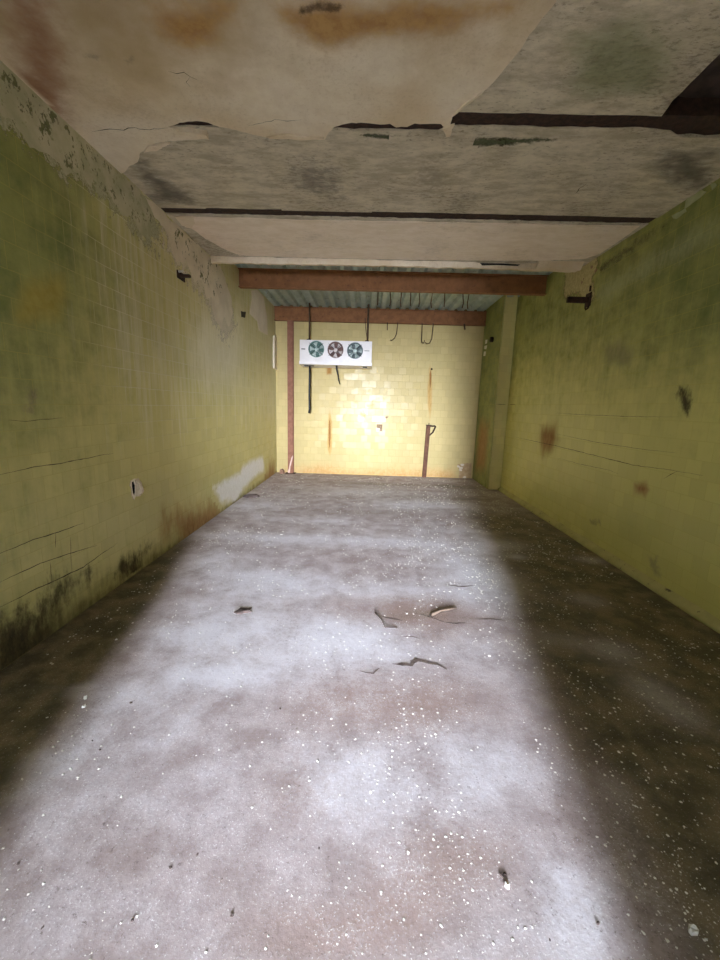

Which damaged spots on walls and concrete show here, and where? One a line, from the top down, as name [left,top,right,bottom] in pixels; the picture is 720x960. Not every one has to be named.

peeling [0,0,640,346]
water stain [673,379,697,424]
crack [4,454,106,474]
corrosion [248,401,493,492]
crack [1,524,116,607]
water stain [0,482,220,671]
crack [362,612,505,674]